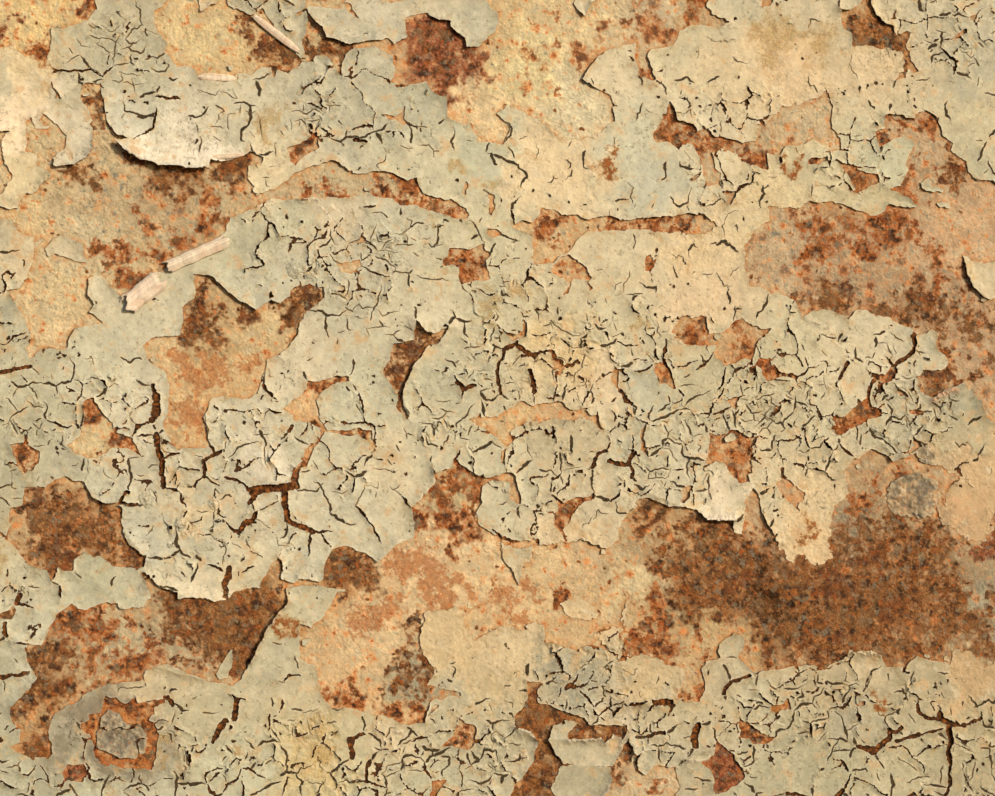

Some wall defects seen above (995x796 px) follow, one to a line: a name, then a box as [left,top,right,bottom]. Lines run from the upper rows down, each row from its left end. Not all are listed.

corrosion [400,13,494,105]
corrosion [166,277,262,441]
crack [0,0,995,596]
corrosion [790,153,995,397]
crack [0,739,36,796]
crack [0,569,82,715]
corrosion [10,484,145,579]
corrosion [10,584,300,781]
peeling [0,535,995,796]
crack [56,642,995,796]
corrosion [512,674,644,796]
corrosion [617,475,995,702]